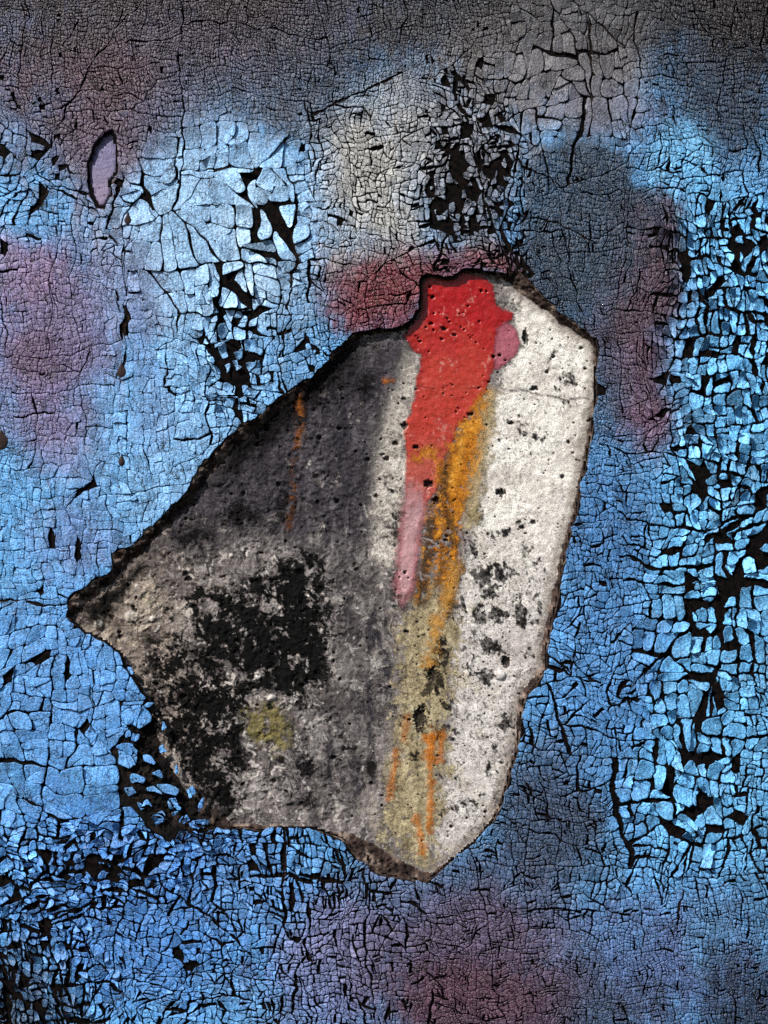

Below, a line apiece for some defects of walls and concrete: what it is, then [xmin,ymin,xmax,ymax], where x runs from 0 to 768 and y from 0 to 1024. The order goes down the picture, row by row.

crack [572,0,643,118]
peeling [0,115,121,227]
crack [174,141,232,174]
crack [153,208,209,257]
crack [277,72,401,392]
crack [122,251,132,366]
crack [163,289,181,382]
spalling [64,14,639,900]
crack [0,563,112,607]
peeling [631,206,768,854]
rust [413,732,446,856]
crack [278,827,288,896]